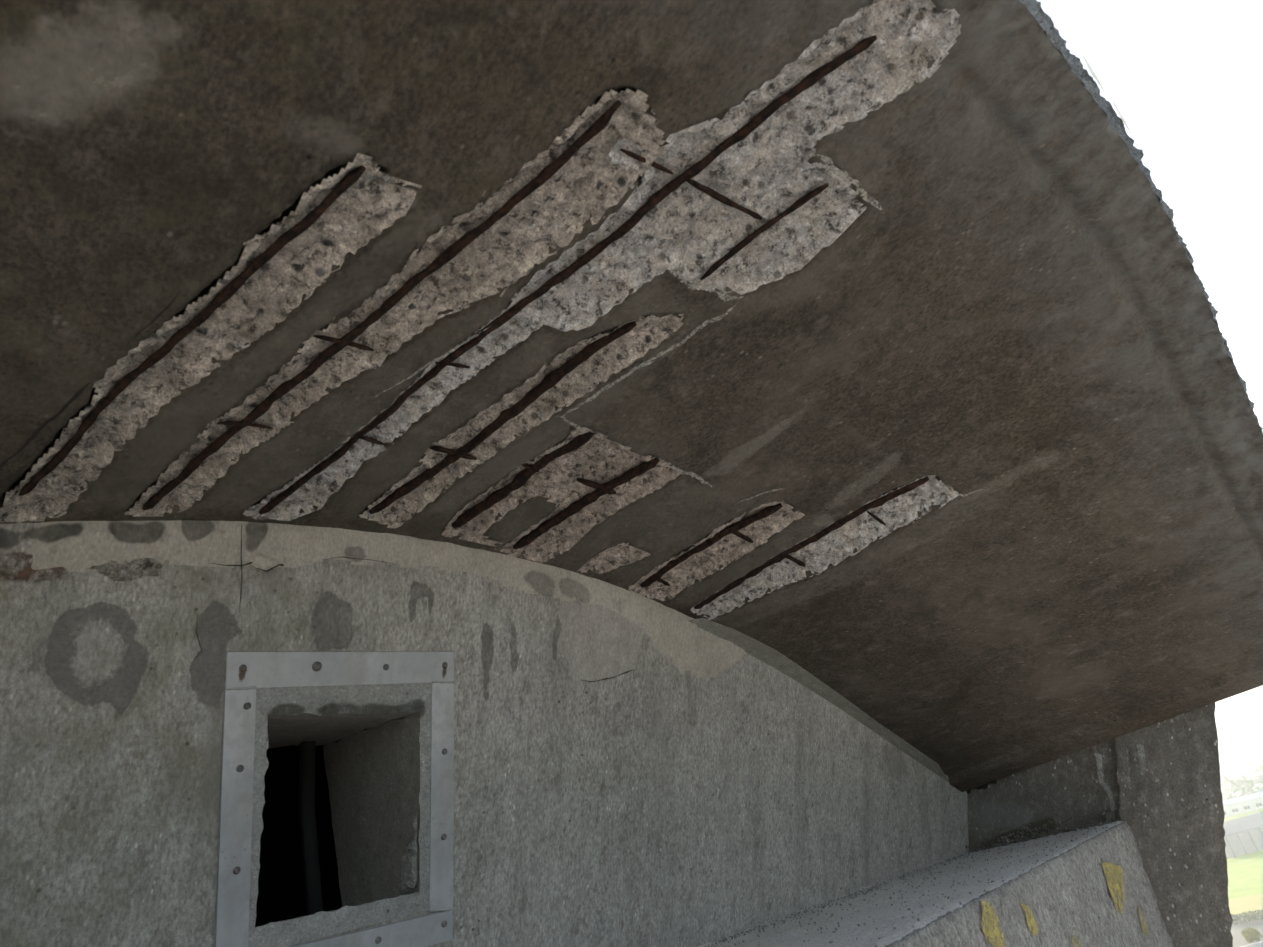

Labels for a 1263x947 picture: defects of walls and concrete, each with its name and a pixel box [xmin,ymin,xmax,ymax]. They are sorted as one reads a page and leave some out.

spalling [124,0,962,529]
spalling [0,153,422,523]
damp [0,524,82,548]
damp [109,522,164,542]
spalling [441,427,683,563]
spalling [578,501,805,601]
spalling [690,475,959,620]
damp [45,602,148,717]
damp [190,601,242,708]